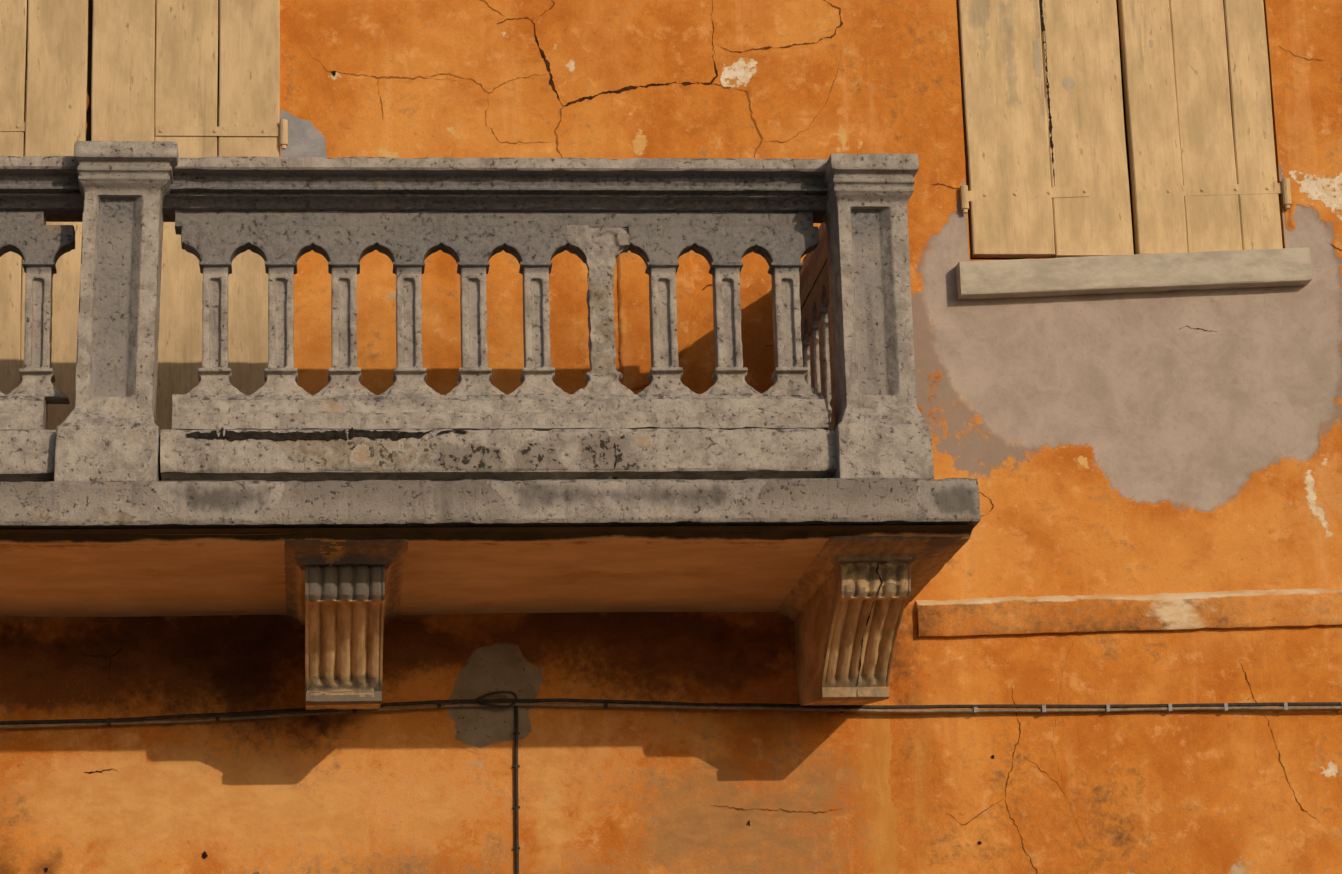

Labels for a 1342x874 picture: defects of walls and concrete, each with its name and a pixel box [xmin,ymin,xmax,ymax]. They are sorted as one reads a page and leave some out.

flaking render [279,107,329,158]
crack [308,0,843,159]
flaking render [909,156,1342,540]
leakage [0,612,953,874]
crack [951,689,1064,874]
crack [1239,661,1319,822]